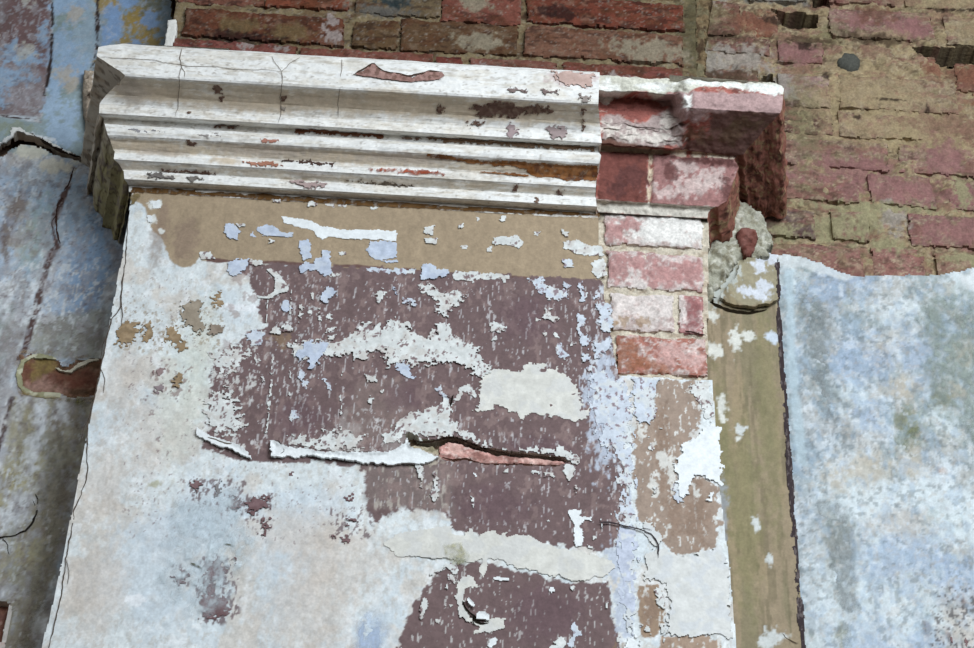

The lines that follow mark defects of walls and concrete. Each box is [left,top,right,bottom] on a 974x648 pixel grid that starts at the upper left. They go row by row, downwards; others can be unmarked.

spalling [353,63,445,82]
peeling [147,169,216,182]
peeling [147,200,161,223]
peeling [114,290,225,353]
spalling [16,353,102,399]
peeling [152,368,183,394]
spalling [186,70,789,648]
crack [0,494,39,553]
spalling [0,605,12,648]